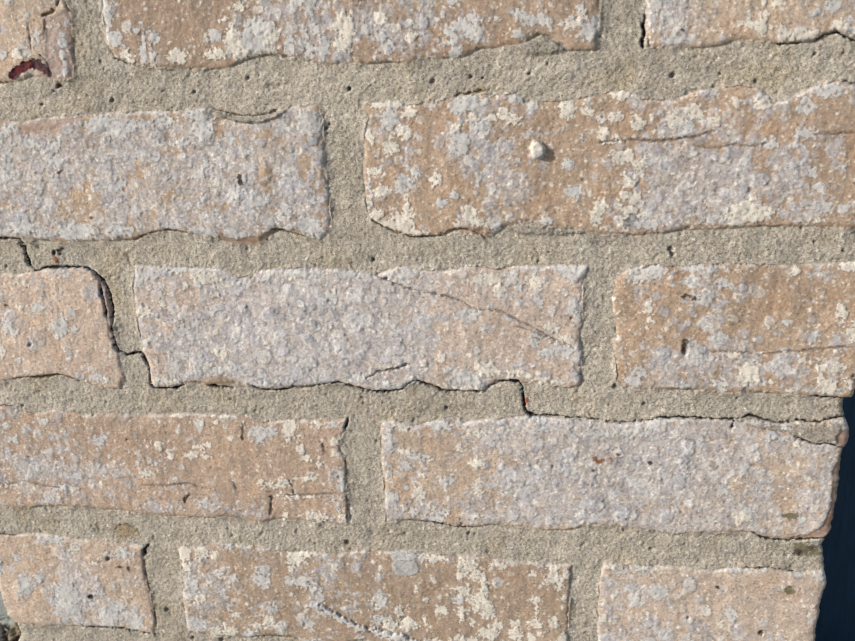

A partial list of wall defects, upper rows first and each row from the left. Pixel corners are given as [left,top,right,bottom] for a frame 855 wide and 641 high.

crack [0,237,182,390]
peeling [0,417,49,444]
crack [210,379,847,448]
peeling [135,413,347,525]
peeling [31,533,82,555]
water stain [787,542,822,557]
peeling [45,582,147,630]